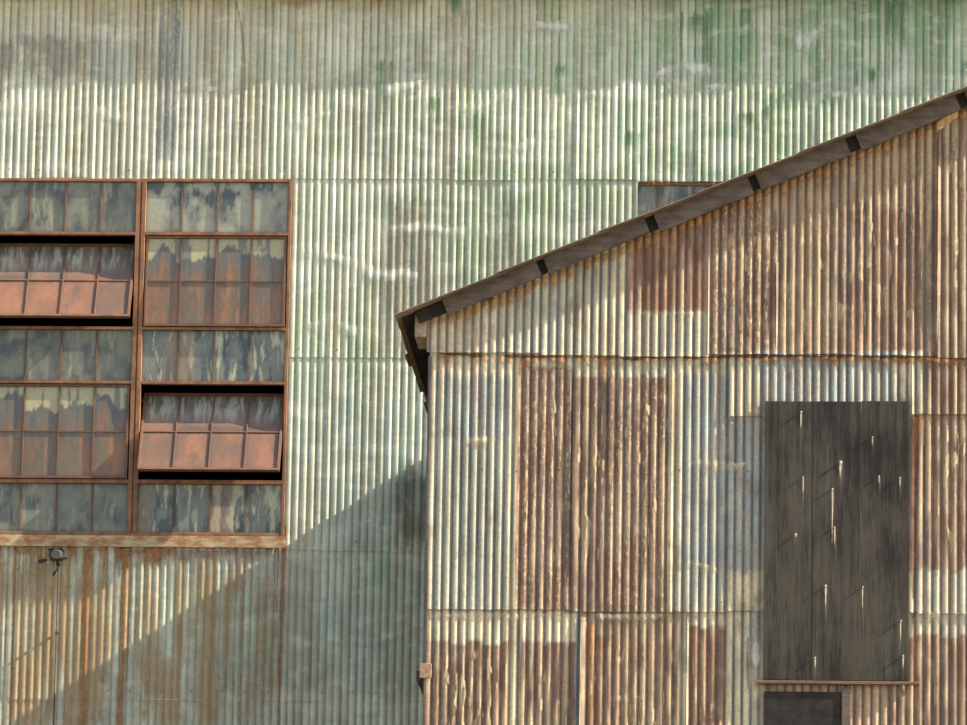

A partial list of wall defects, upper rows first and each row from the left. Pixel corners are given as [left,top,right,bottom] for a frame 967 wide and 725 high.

water stain [159,1,182,157]
water stain [385,80,423,94]
water stain [686,62,709,75]
water stain [795,28,821,50]
water stain [311,251,349,262]
water stain [364,199,462,350]
water stain [497,205,525,269]
rust [440,353,967,373]
rust [912,416,924,600]
rust [10,546,55,725]
rust [67,547,185,725]
rust [268,527,286,700]